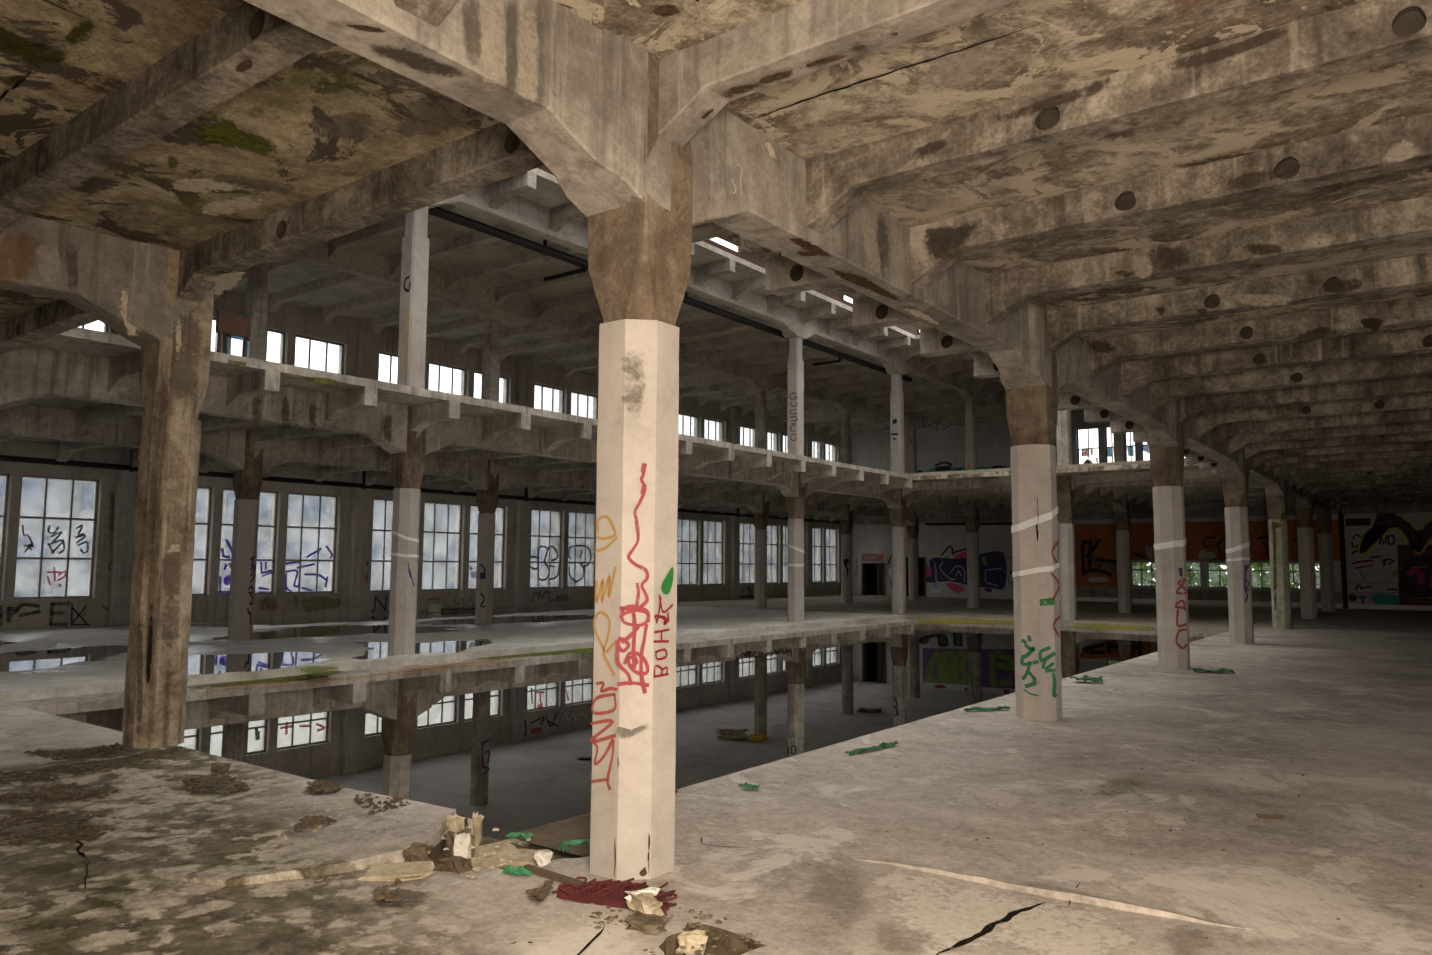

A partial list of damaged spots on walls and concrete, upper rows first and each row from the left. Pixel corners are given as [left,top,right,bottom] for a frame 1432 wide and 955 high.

crack [43,0,90,20]
crack [0,71,32,99]
crack [937,882,1081,955]